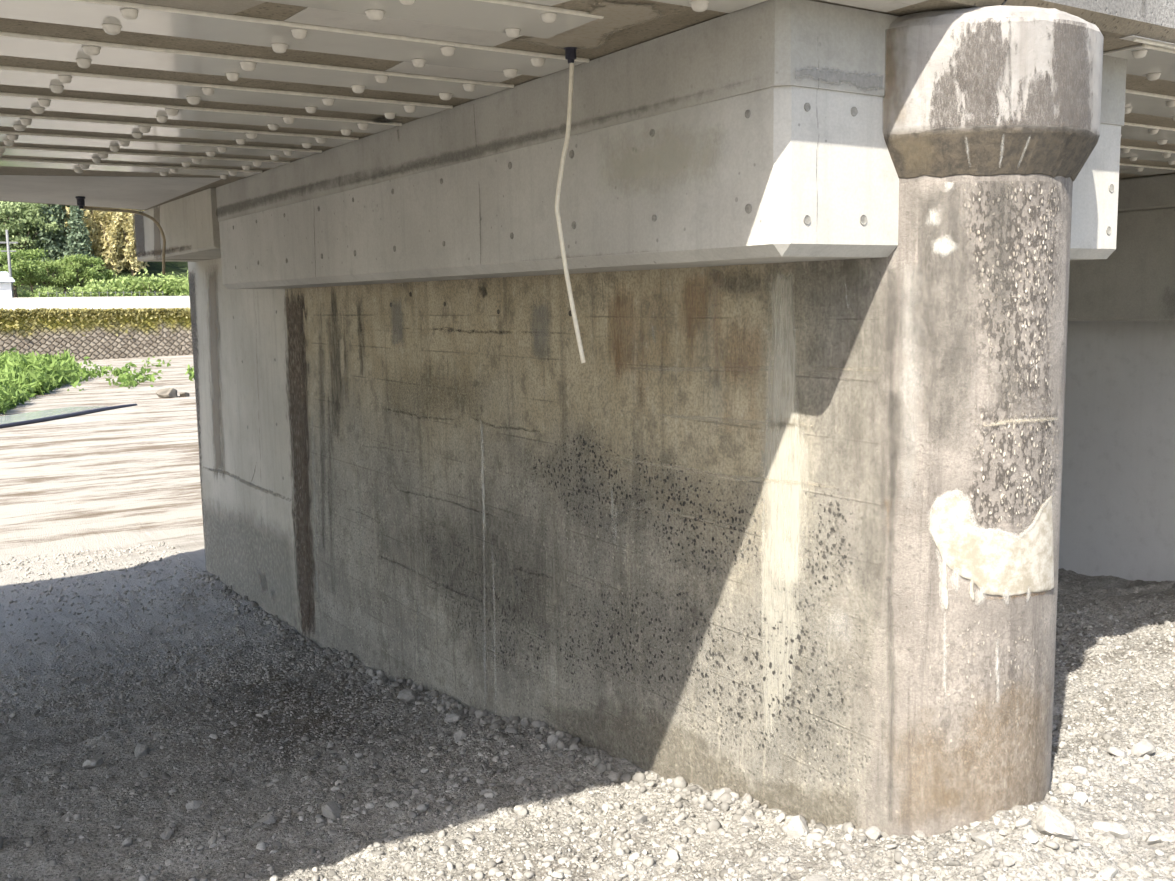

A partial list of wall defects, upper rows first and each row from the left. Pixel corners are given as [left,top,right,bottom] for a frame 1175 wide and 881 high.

damp [188,271,324,637]
damp [331,294,340,432]
damp [762,276,804,739]
damp [931,490,1049,539]
spalling [929,182,1061,610]